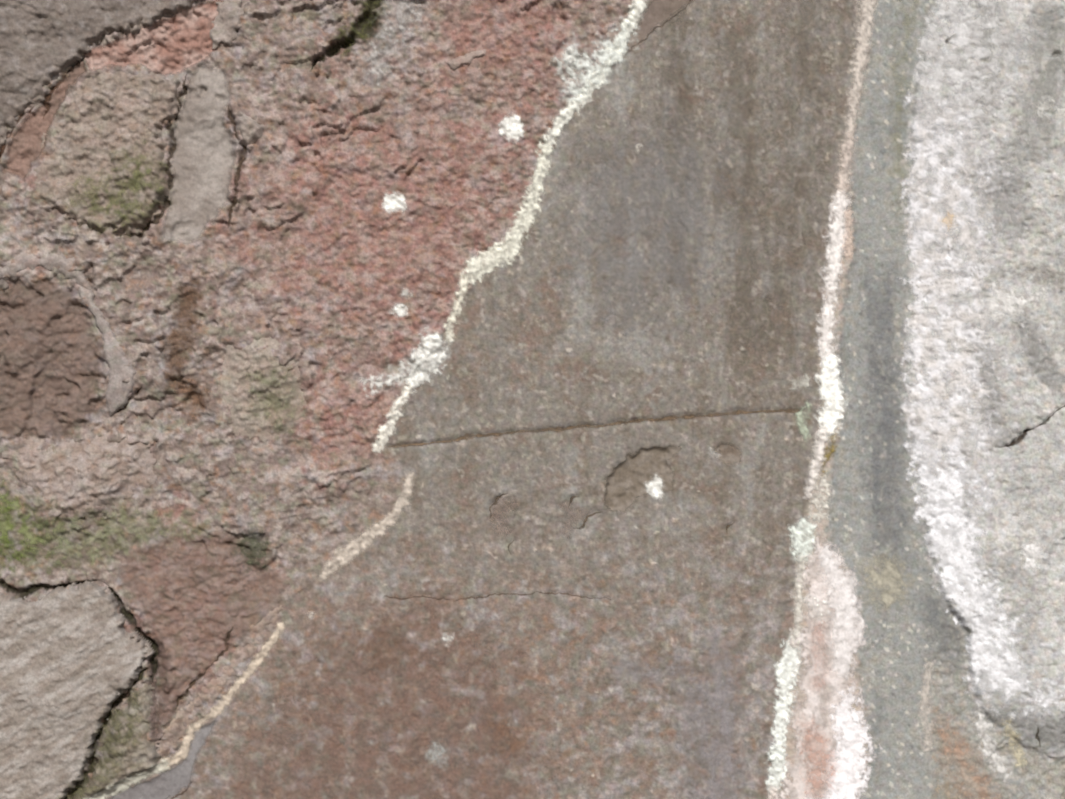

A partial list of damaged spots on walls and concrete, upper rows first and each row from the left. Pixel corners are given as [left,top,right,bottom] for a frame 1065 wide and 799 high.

crack [0,43,93,158]
crack [124,74,187,237]
crack [228,106,246,227]
crack [311,0,381,70]
water stain [337,0,421,85]
water stain [364,0,646,452]
crack [388,409,804,447]
water stain [766,0,908,799]
crack [995,406,1065,447]
crack [0,580,158,799]
crack [156,628,233,749]